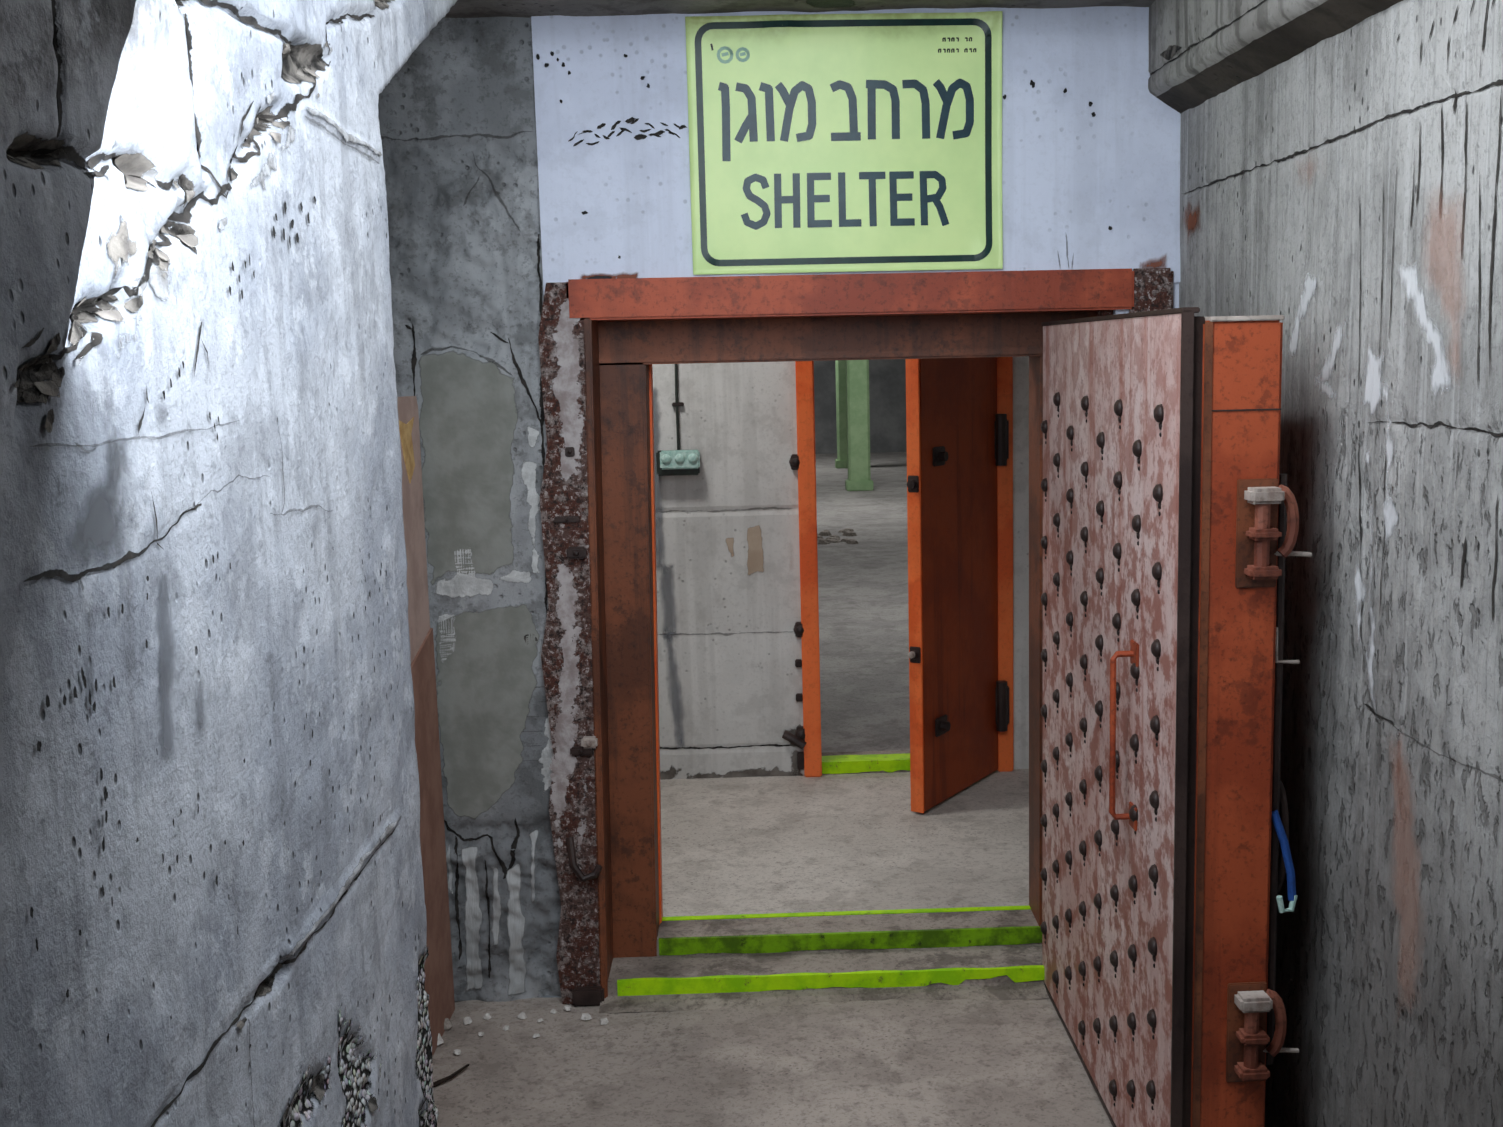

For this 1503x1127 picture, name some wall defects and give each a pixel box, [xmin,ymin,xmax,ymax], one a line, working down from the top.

damp [1420,0,1494,77]
crack [1182,79,1503,194]
crack [6,0,377,434]
corrosion [1142,258,1165,268]
damp [1289,275,1316,354]
damp [1439,81,1503,383]
damp [1316,134,1451,698]
crack [1369,421,1503,437]
crack [24,491,202,582]
crack [1365,704,1394,724]
damp [446,830,538,995]
crack [150,817,400,1127]